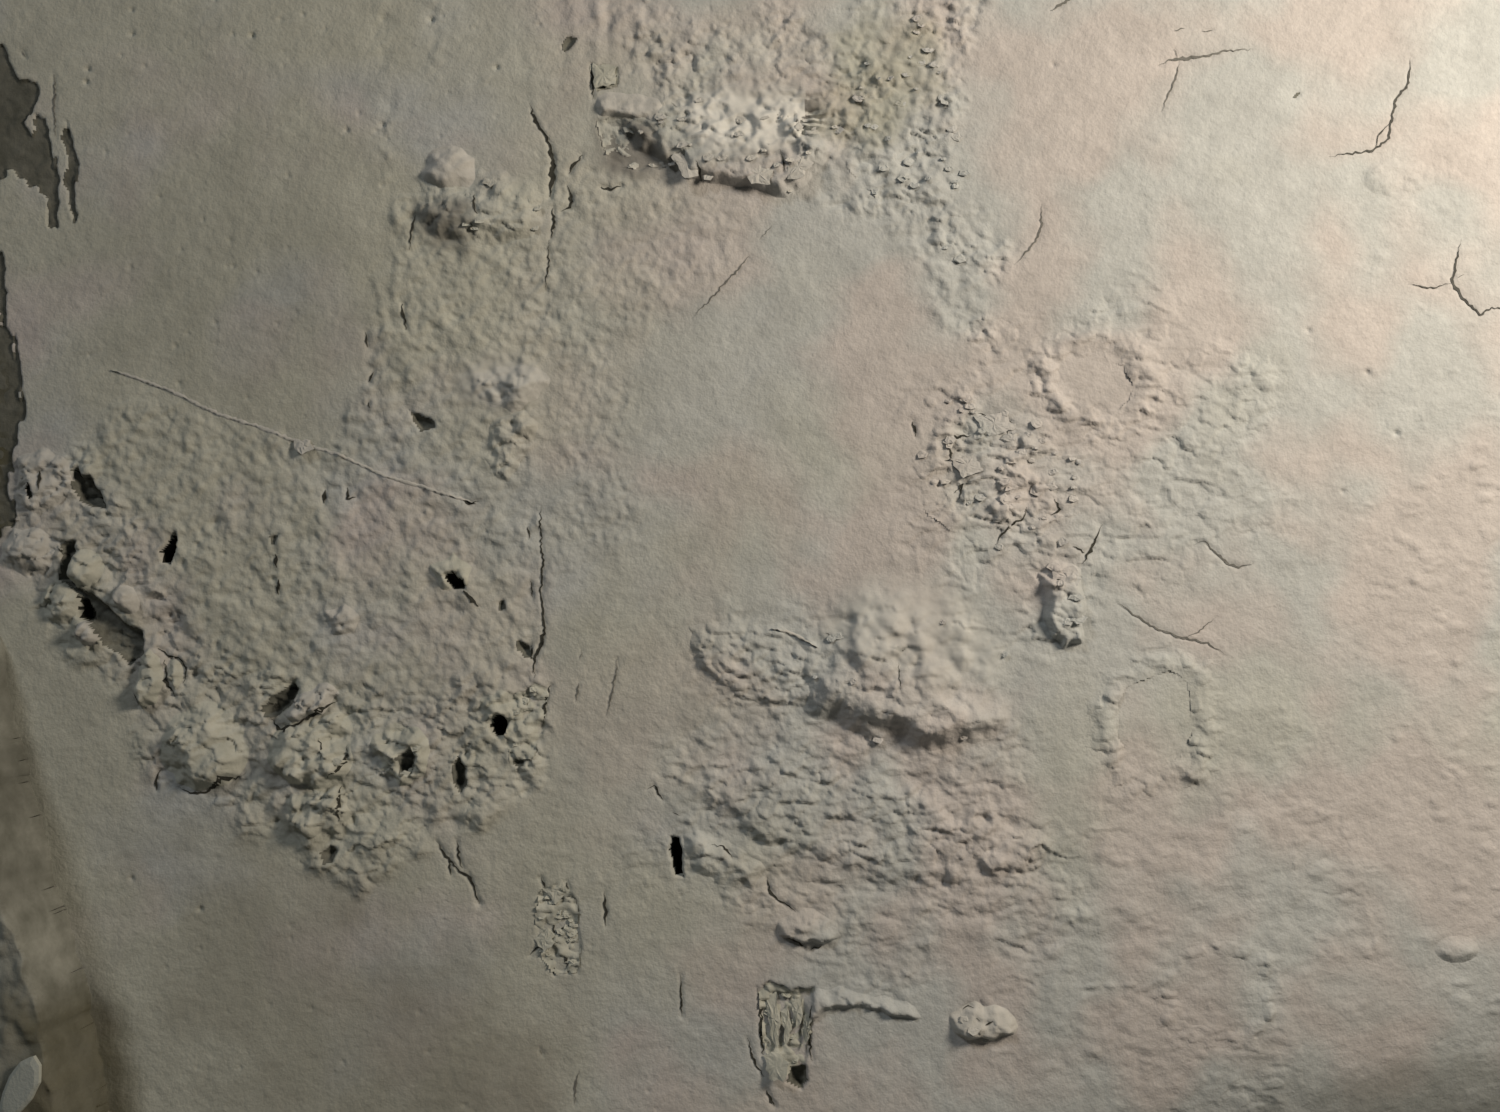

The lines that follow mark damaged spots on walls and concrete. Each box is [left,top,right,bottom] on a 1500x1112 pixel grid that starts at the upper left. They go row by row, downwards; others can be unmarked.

spalling [0,44,79,228]
crack [1160,28,1250,111]
crack [1334,63,1411,157]
crack [1413,239,1500,316]
spalling [0,252,26,537]
peeling [535,879,581,975]
peeling [757,981,815,1082]
spalling [0,1055,42,1112]